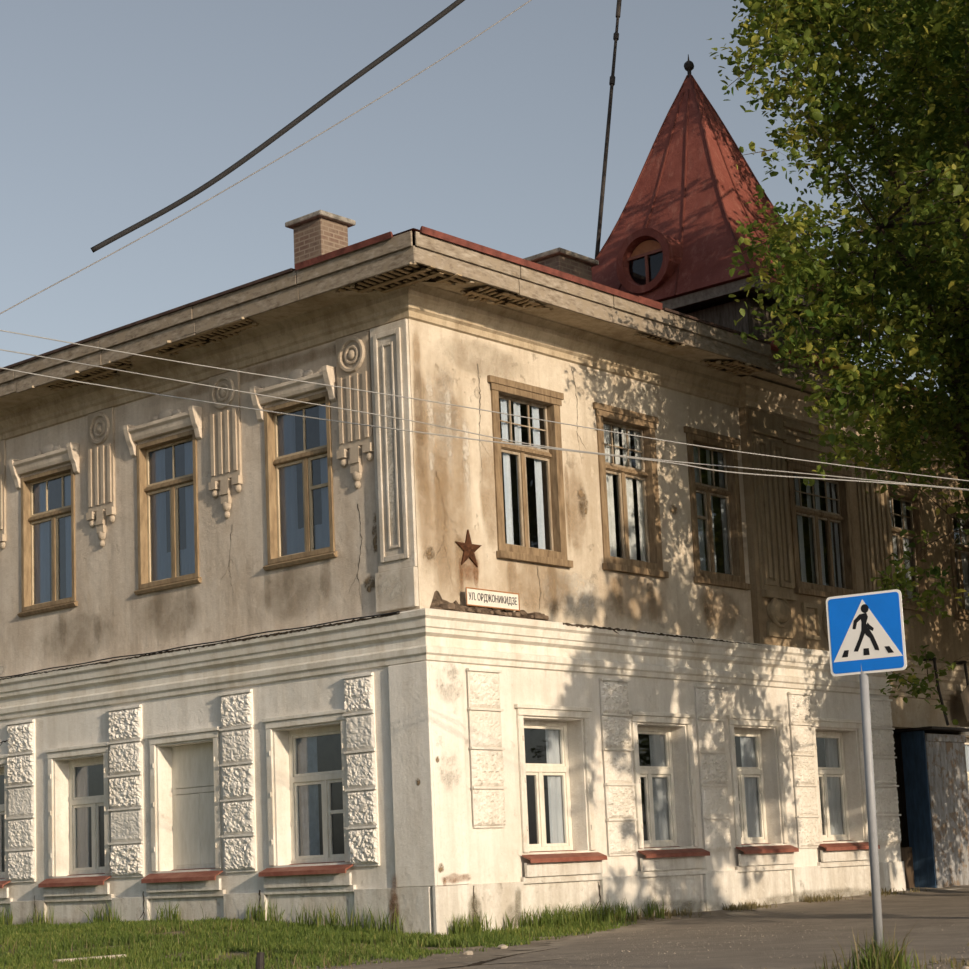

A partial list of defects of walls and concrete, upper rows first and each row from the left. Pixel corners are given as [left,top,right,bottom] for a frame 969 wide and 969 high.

crack [0,504,400,681]
peeling [439,602,549,621]